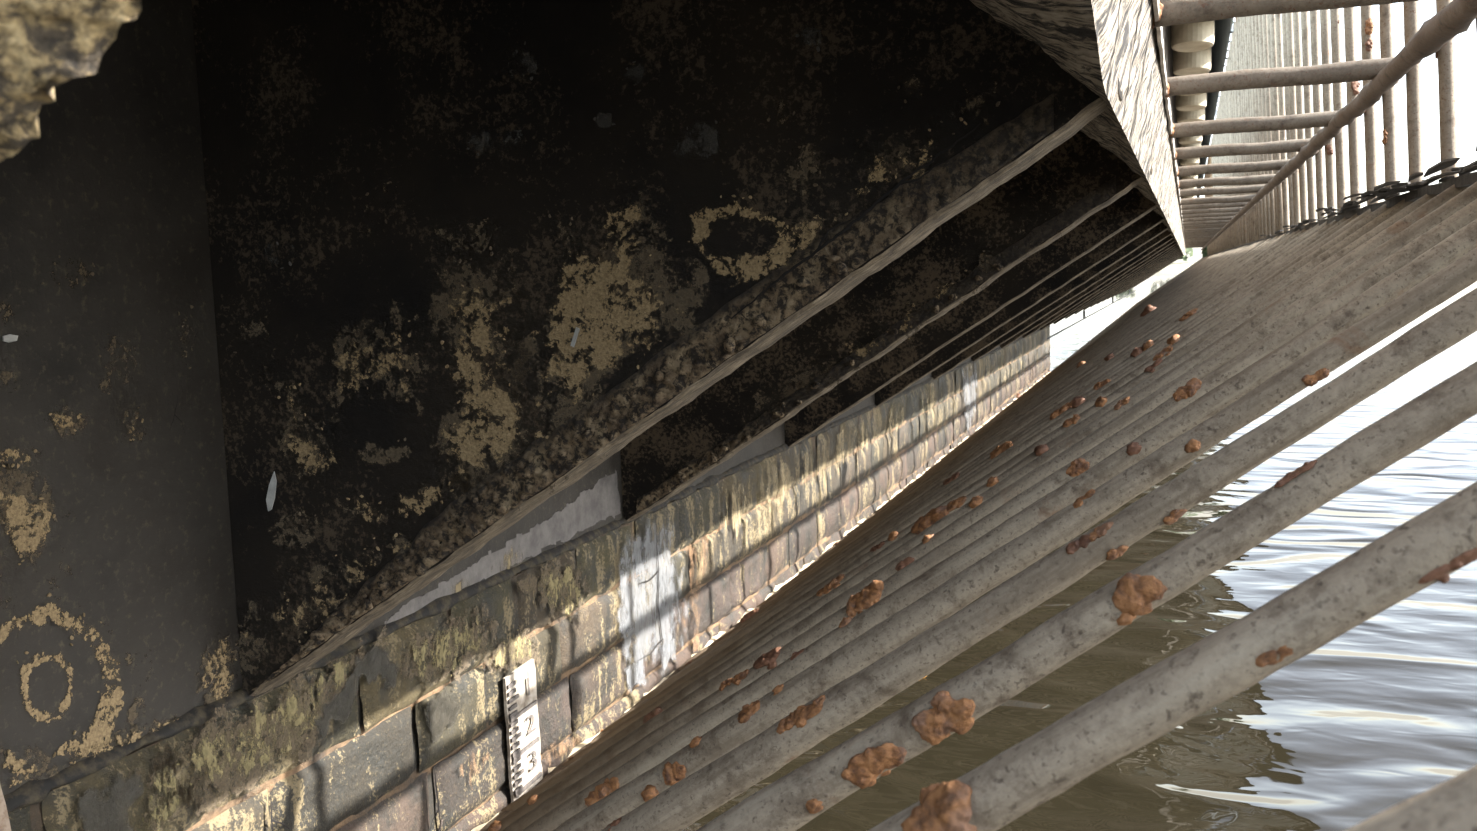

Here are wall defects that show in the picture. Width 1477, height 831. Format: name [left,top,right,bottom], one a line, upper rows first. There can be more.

spalling [0,0,141,162]